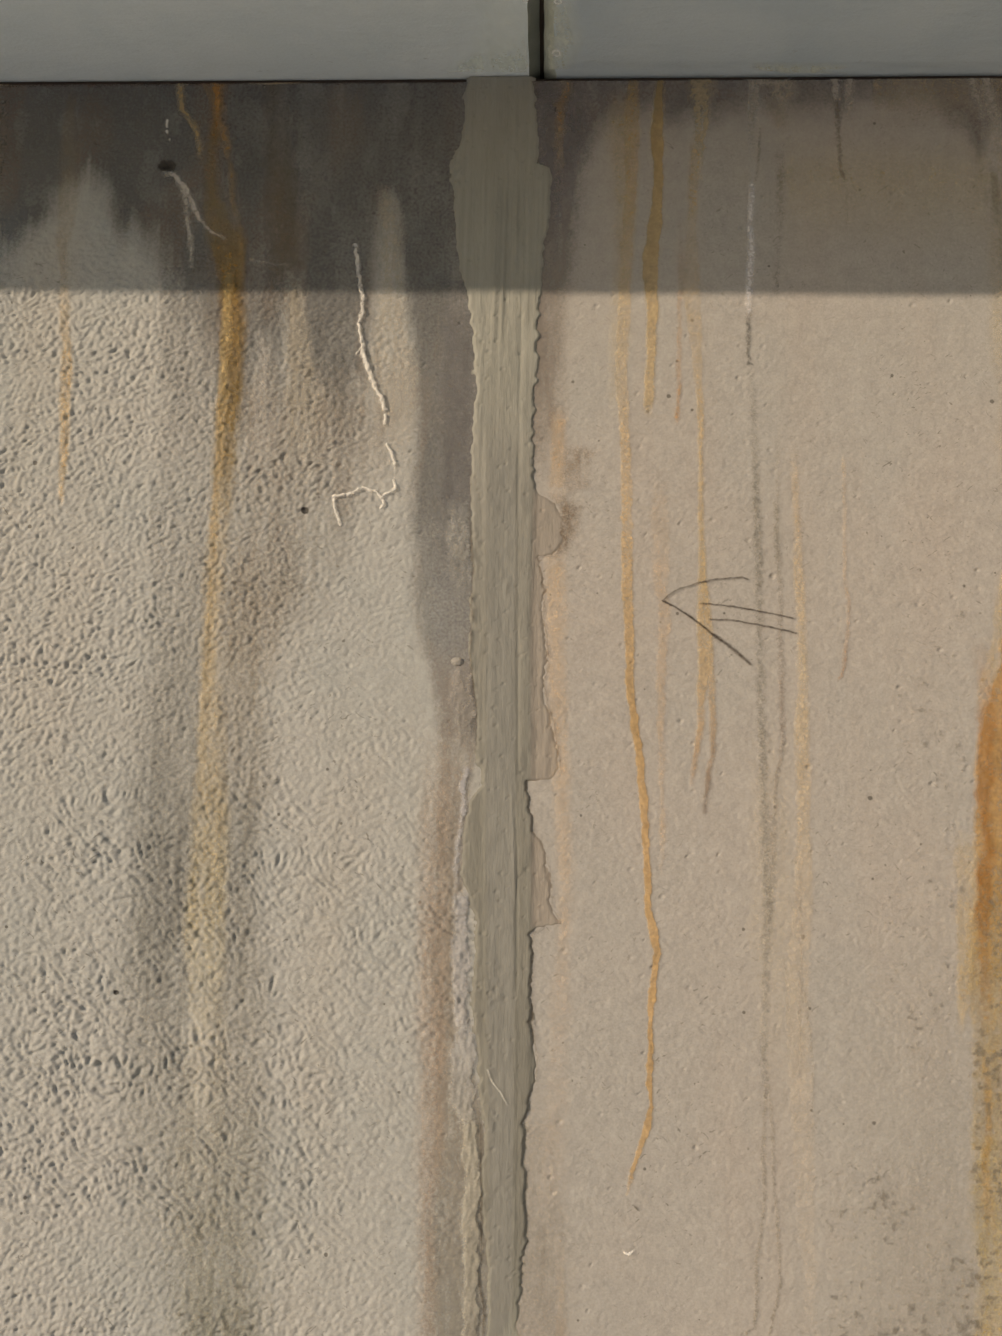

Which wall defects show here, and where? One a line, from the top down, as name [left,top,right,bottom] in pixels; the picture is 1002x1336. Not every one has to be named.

corrosion [208,164,243,501]
crack [333,248,397,526]
corrosion [613,80,664,405]
damp [0,82,489,1336]
corrosion [620,487,661,1179]
corrosion [959,640,1002,1033]